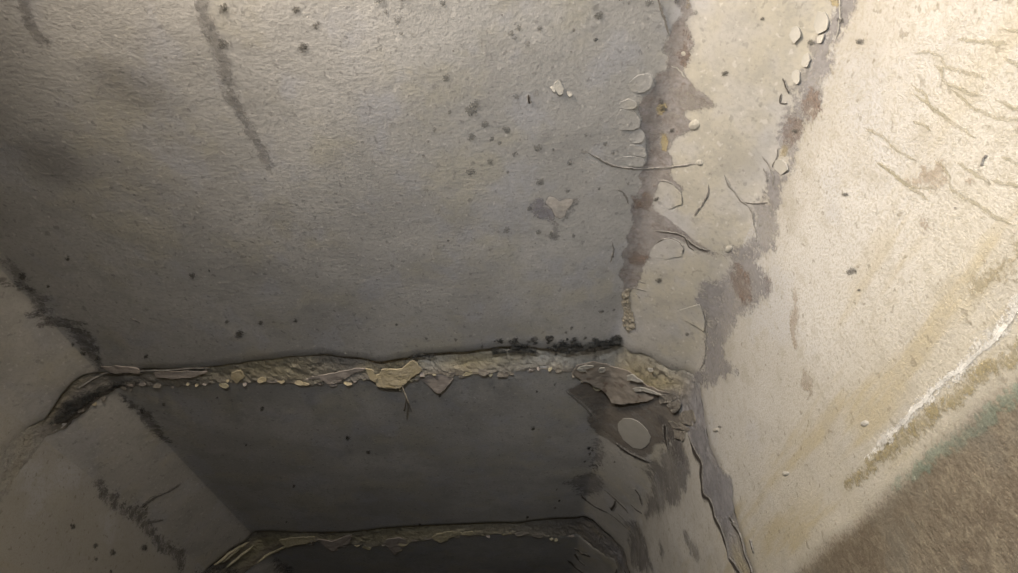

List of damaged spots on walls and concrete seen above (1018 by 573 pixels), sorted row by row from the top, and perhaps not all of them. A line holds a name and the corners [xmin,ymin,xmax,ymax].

water stain [781,0,856,140]
water stain [481,0,714,355]
water stain [762,172,785,215]
peeling [101,365,207,390]
peeling [219,360,514,393]
spalling [528,361,696,441]
water stain [569,383,689,516]
peeling [618,418,651,449]
water stain [695,240,774,388]
water stain [864,294,1018,461]